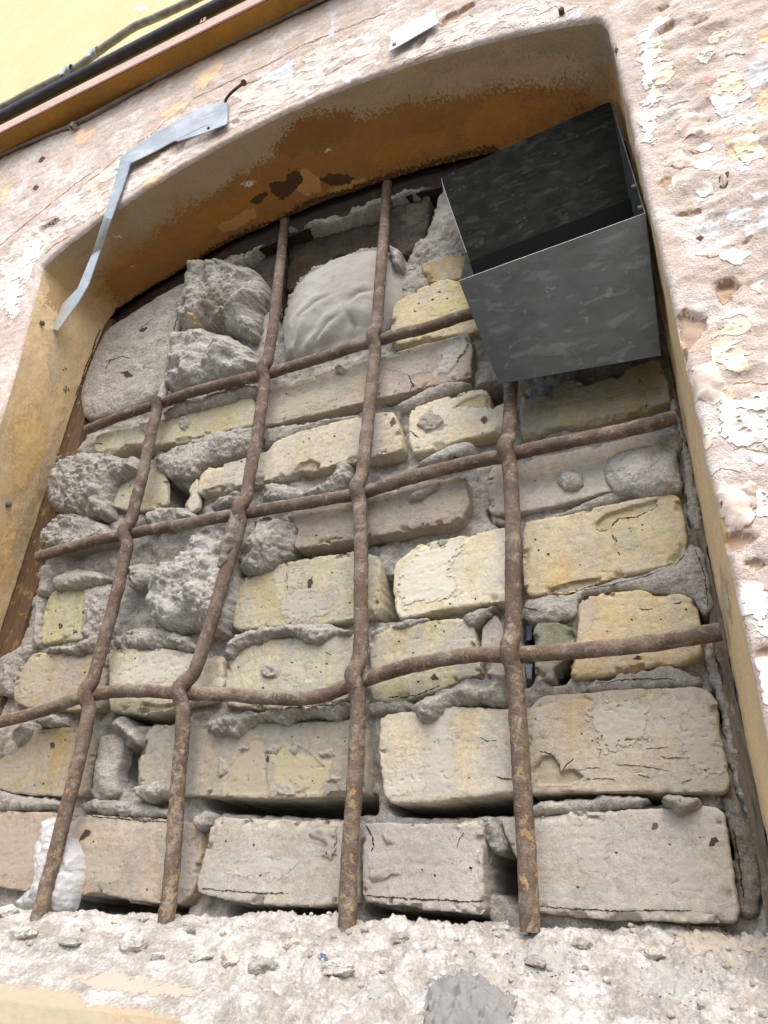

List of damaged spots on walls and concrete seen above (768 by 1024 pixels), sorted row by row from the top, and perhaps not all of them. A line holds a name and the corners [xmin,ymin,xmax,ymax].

peeling [635,4,676,145]
rust [40,79,594,322]
peeling [674,142,729,217]
peeling [676,236,763,373]
peeling [702,391,768,450]
rust [419,488,466,524]
crack [596,504,658,555]
rust [578,596,596,639]
peeling [720,518,768,705]
crack [540,735,692,783]
rust [672,701,726,778]
rust [0,813,40,886]